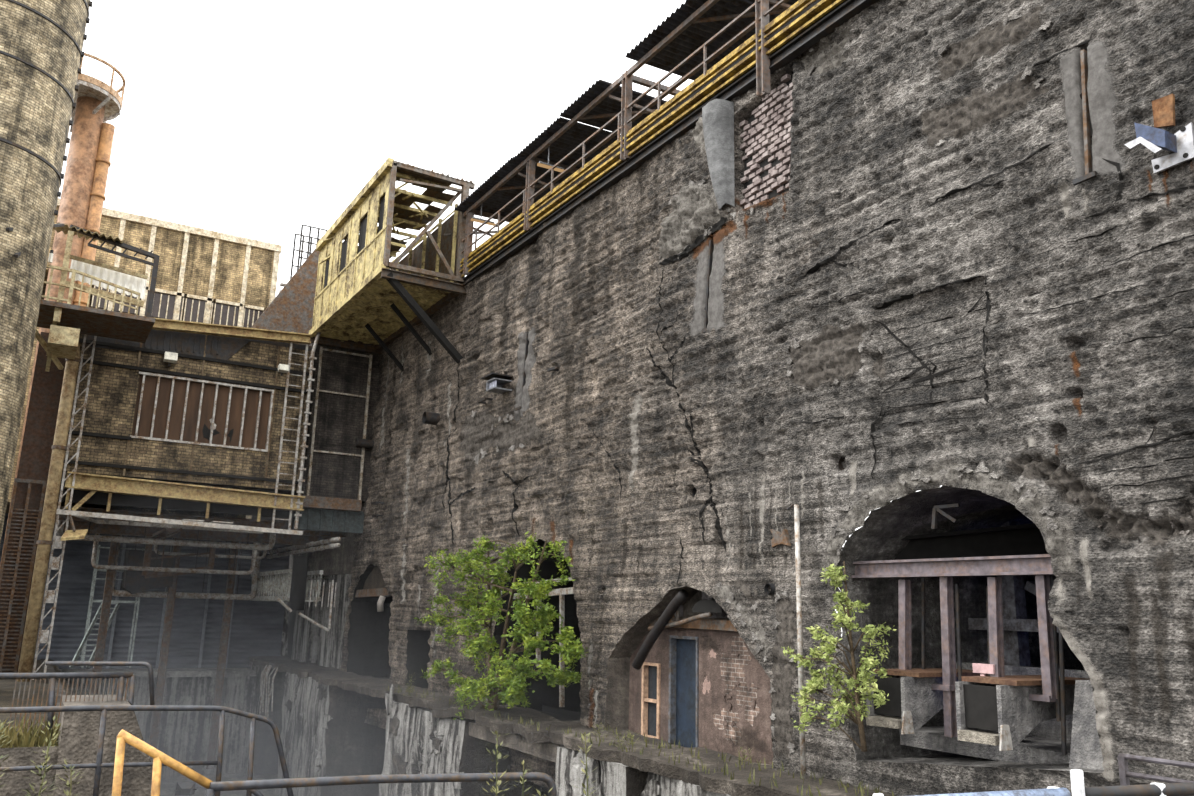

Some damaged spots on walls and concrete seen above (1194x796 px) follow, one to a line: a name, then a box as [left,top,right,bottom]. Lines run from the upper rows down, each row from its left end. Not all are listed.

spalling [658,29,851,265]
corrosion [1148,170,1170,205]
crack [442,363,476,544]
crack [646,267,726,584]